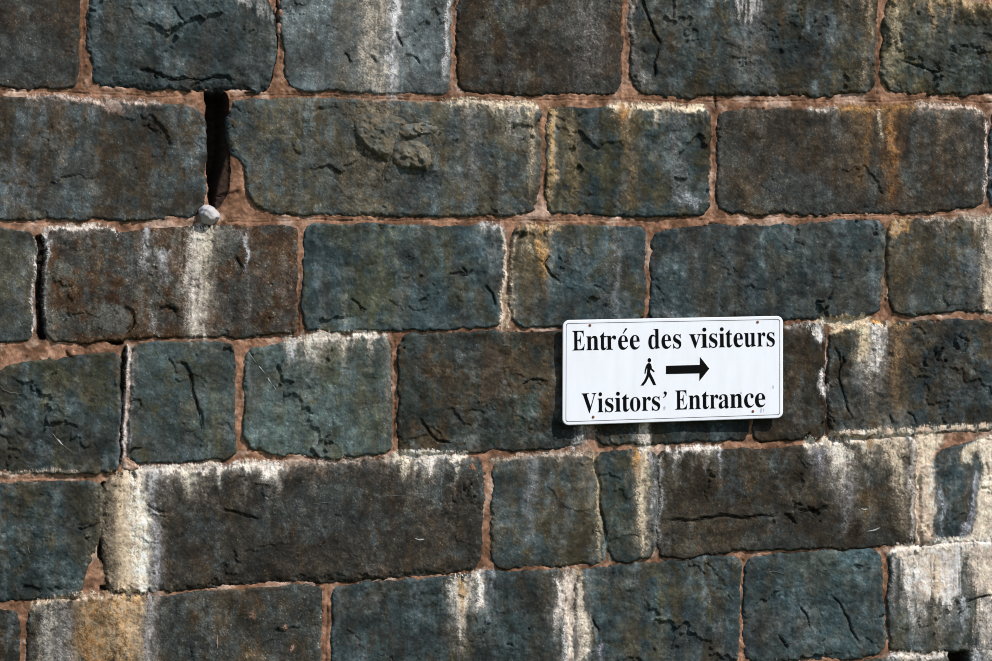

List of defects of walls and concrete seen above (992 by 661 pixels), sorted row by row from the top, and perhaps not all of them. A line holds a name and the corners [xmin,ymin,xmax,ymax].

leakage [358,0,401,115]
leakage [139,226,168,282]
leakage [182,223,218,340]
leakage [922,213,992,314]
leakage [284,329,388,357]
leakage [787,313,888,379]
leakage [31,344,468,661]
leakage [803,422,992,661]
leakage [448,568,495,640]
leakage [553,566,603,661]